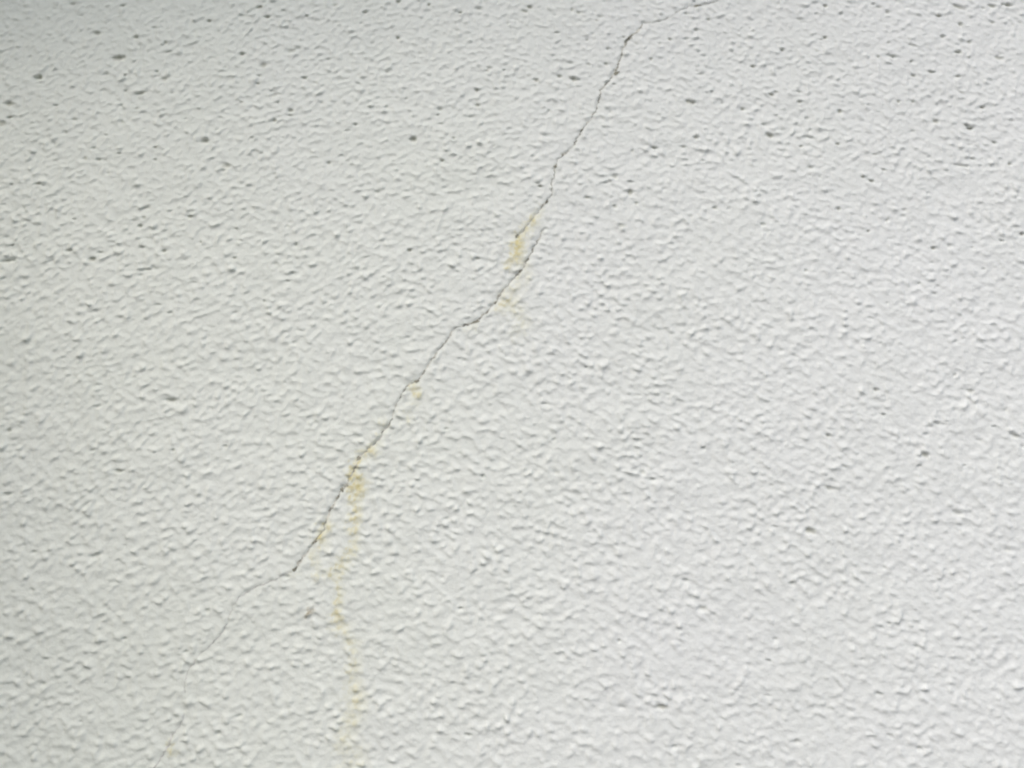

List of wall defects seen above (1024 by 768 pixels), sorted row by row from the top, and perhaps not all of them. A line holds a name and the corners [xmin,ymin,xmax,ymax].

crack [153,1,717,768]